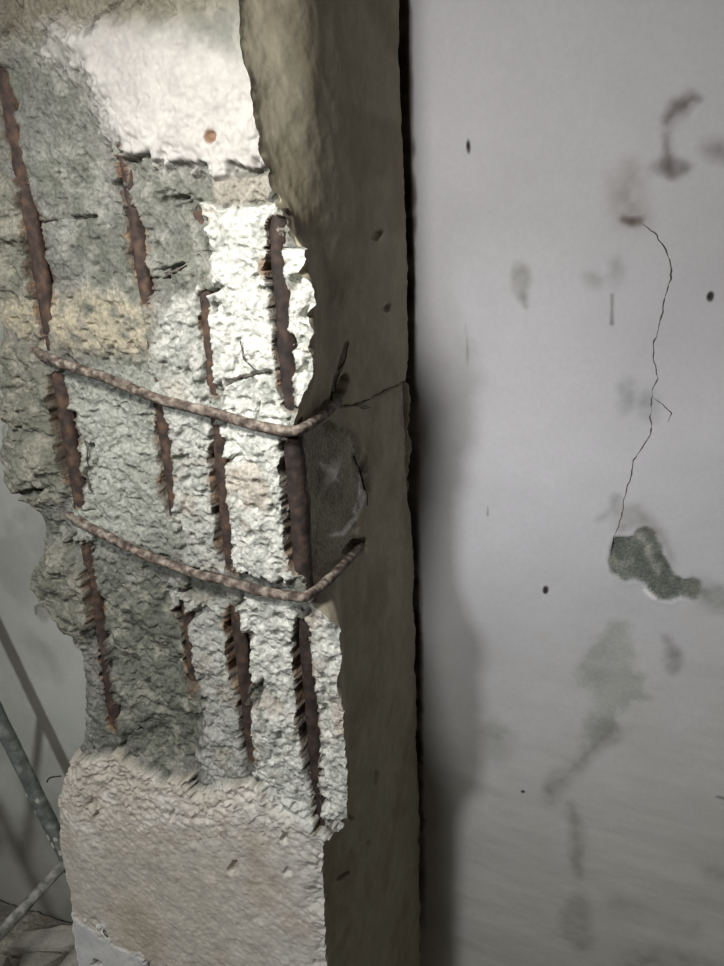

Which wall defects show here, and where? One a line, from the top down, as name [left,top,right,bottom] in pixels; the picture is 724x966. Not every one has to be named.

rust [13,162,57,336]
rust [42,372,88,509]
rust [152,403,180,522]
spalling [0,0,364,966]
rust [197,289,214,362]
rust [206,425,241,576]
rust [261,213,299,412]
rust [276,440,296,574]
crack [611,224,672,549]
rust [170,600,200,687]
rust [223,605,262,768]
rust [289,620,331,836]